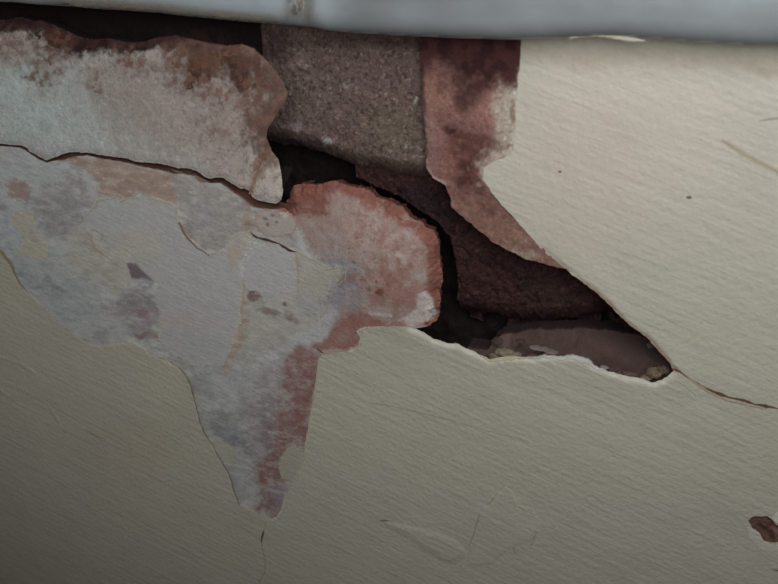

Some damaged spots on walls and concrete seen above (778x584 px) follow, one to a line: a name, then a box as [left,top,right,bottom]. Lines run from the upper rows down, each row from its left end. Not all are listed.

water stain [0,17,288,166]
water stain [419,37,521,104]
crack [0,144,291,211]
crack [251,233,296,252]
peeling [0,16,673,519]
crack [673,369,778,411]
flaking render [746,513,778,551]